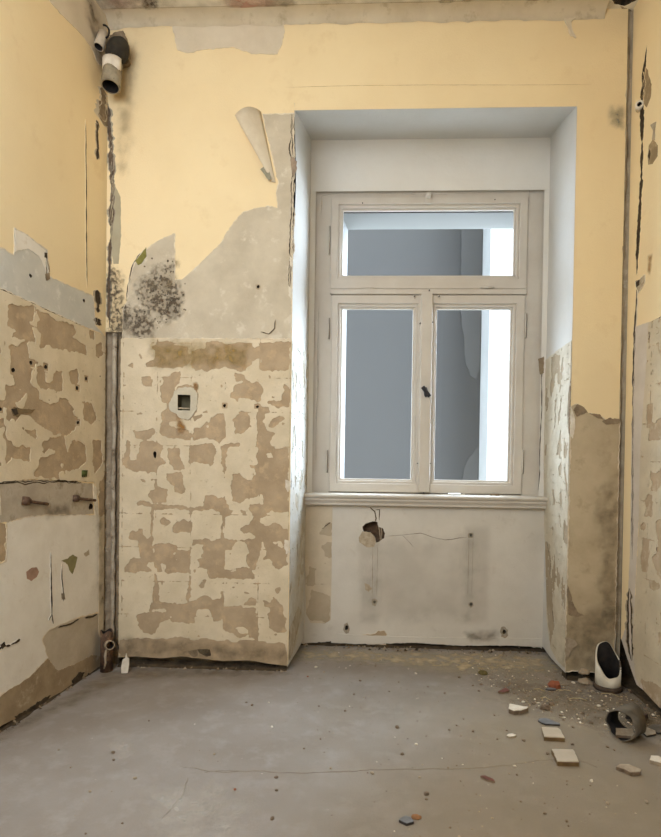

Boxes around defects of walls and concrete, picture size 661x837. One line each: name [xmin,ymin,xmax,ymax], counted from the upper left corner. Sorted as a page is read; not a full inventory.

peeling [172,24,285,55]
spalling [612,0,636,12]
peeling [0,227,104,335]
mould [106,260,186,338]
spalling [11,407,35,417]
peeling [117,107,661,717]
flaking render [0,514,101,733]
crack [162,759,554,818]